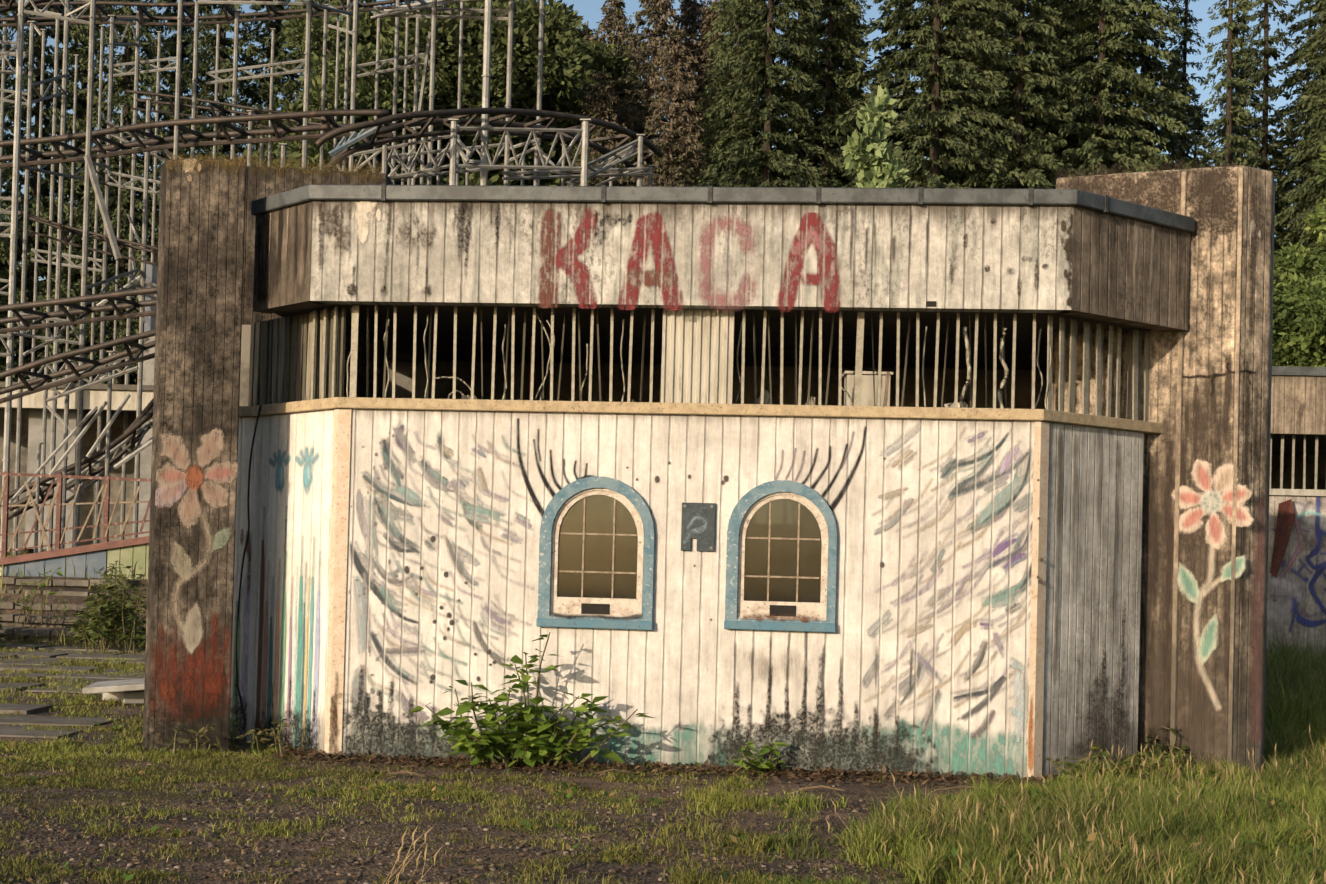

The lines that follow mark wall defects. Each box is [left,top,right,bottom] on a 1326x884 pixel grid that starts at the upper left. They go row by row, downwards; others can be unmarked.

leakage [454,202,472,266]
leakage [1096,211,1163,296]
leakage [1055,431,1077,642]
leakage [1075,355,1257,772]